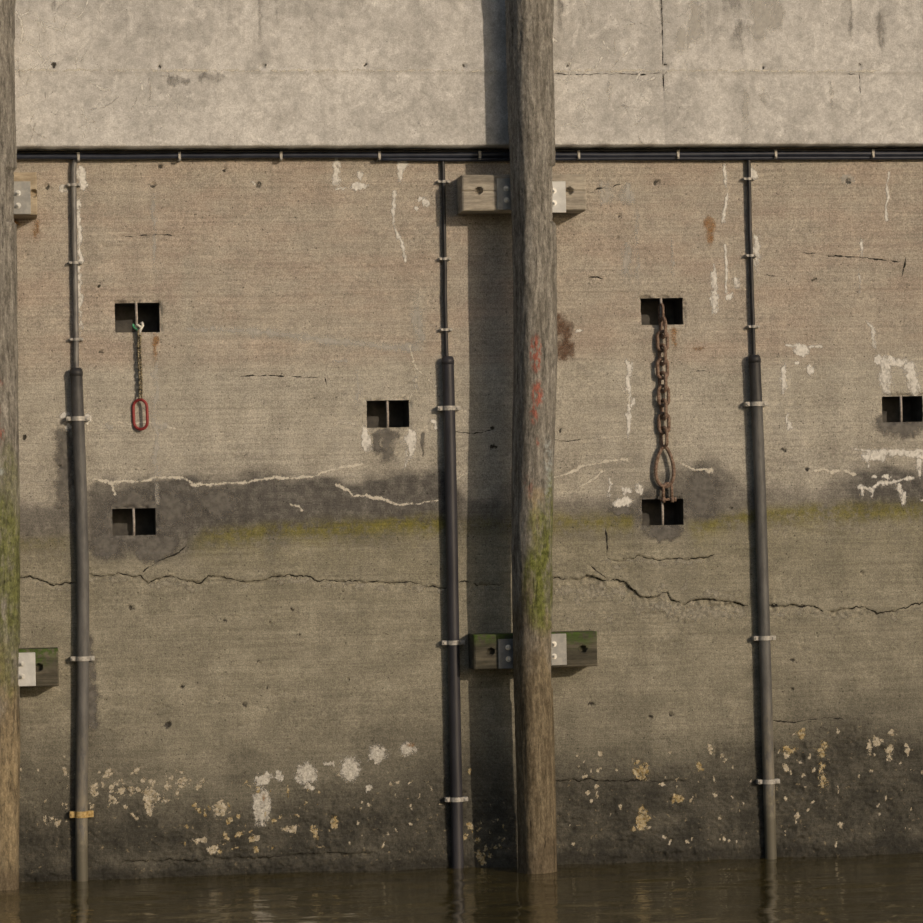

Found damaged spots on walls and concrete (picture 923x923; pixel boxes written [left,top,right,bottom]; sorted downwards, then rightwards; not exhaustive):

crack [803,239,906,286]
rust [557,314,574,360]
leakage [867,323,921,397]
crack [91,463,438,506]
leakage [854,415,923,505]
crack [20,545,503,594]
crack [553,529,747,622]
crack [769,602,923,623]